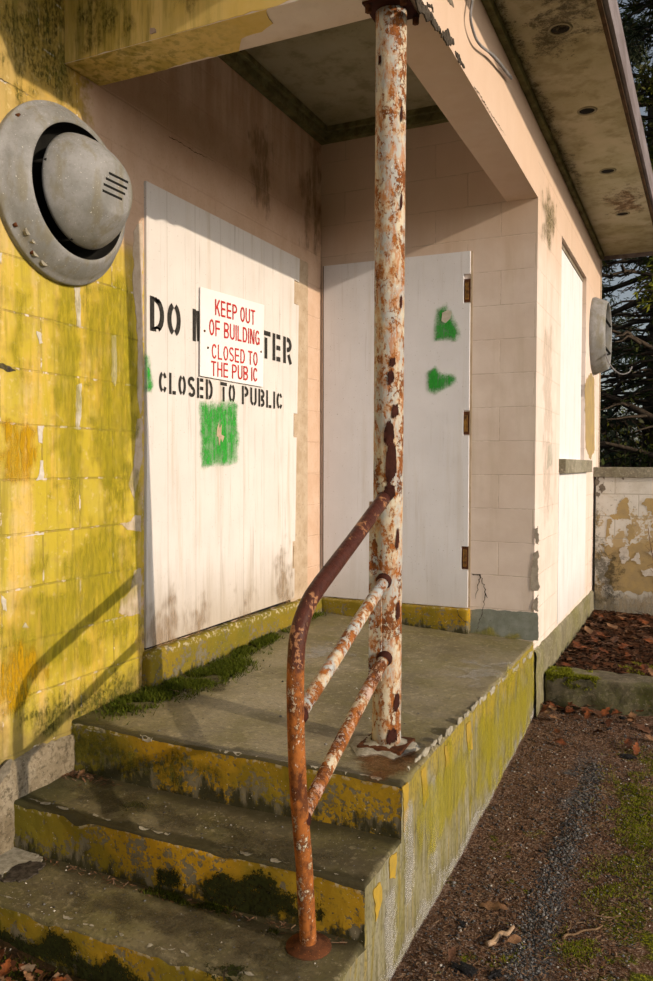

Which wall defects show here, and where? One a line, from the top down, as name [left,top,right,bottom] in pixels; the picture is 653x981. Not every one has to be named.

peeling [64,0,288,86]
spalling [415,0,465,68]
leakage [495,0,601,190]
leakage [56,280,138,499]
rust [388,357,396,385]
rust [384,403,399,501]
peeling [600,497,653,595]
leakage [1,529,133,664]
rust [356,751,417,783]
rust [386,727,397,745]
peeling [373,852,397,922]